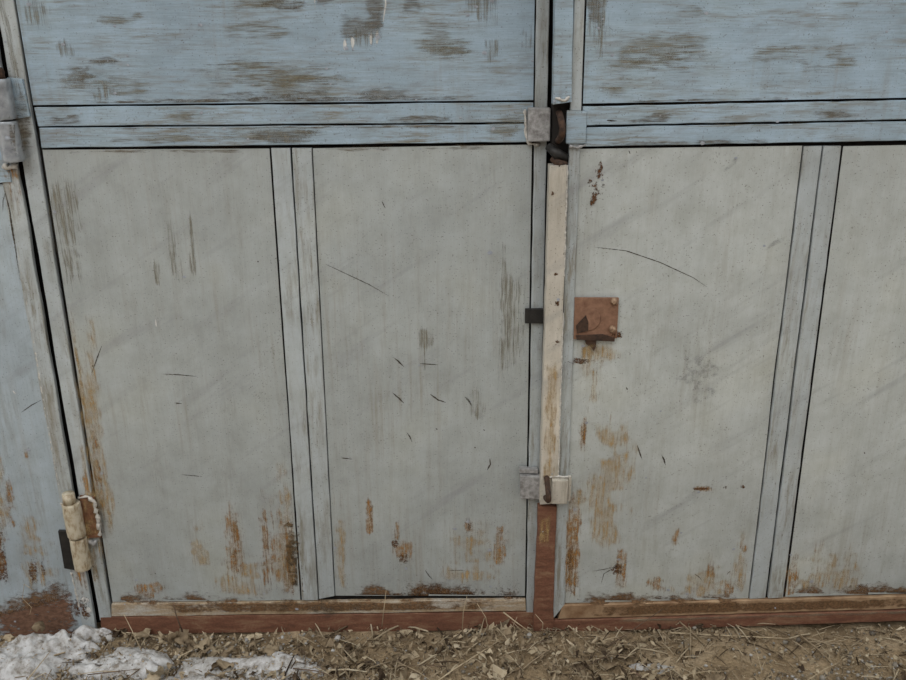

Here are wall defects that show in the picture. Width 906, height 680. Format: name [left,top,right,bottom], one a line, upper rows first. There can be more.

peeling [343,0,384,51]
peeling [610,35,699,70]
rust [588,162,604,205]
rust [565,454,632,593]
rust [0,522,82,637]
rust [121,511,297,607]
rust [583,565,742,607]
rust [785,564,906,595]